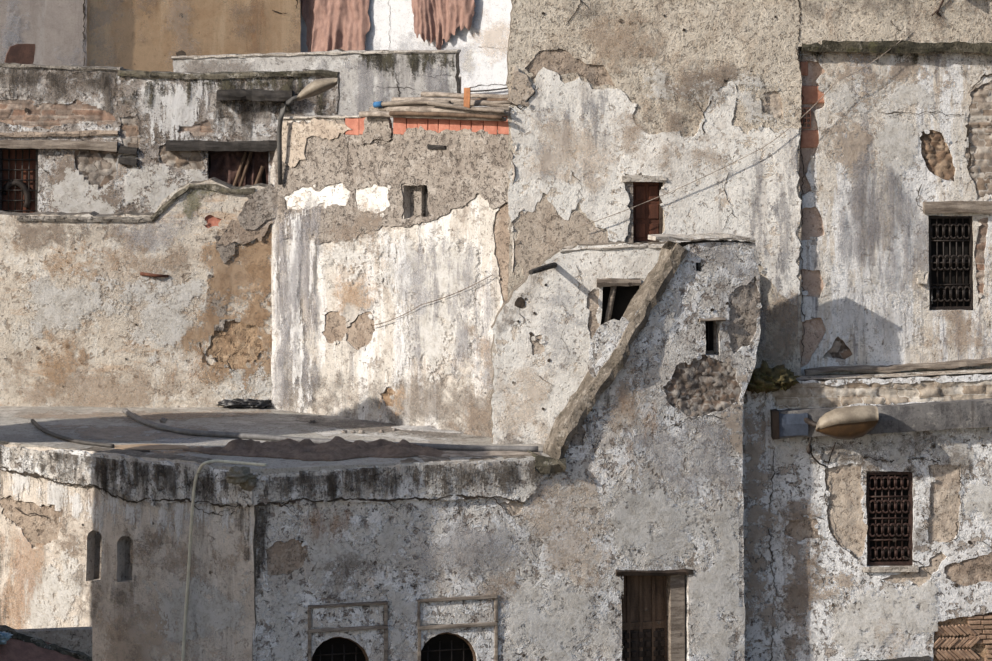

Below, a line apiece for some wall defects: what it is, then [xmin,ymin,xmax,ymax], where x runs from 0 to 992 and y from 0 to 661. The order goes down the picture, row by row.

crack [199,342,261,373]
spalling [205,317,262,376]
spalling [322,310,375,351]
peeling [494,46,992,661]
spalling [0,494,65,548]
damp [0,451,264,587]
crack [1,466,538,558]
damp [301,471,337,499]